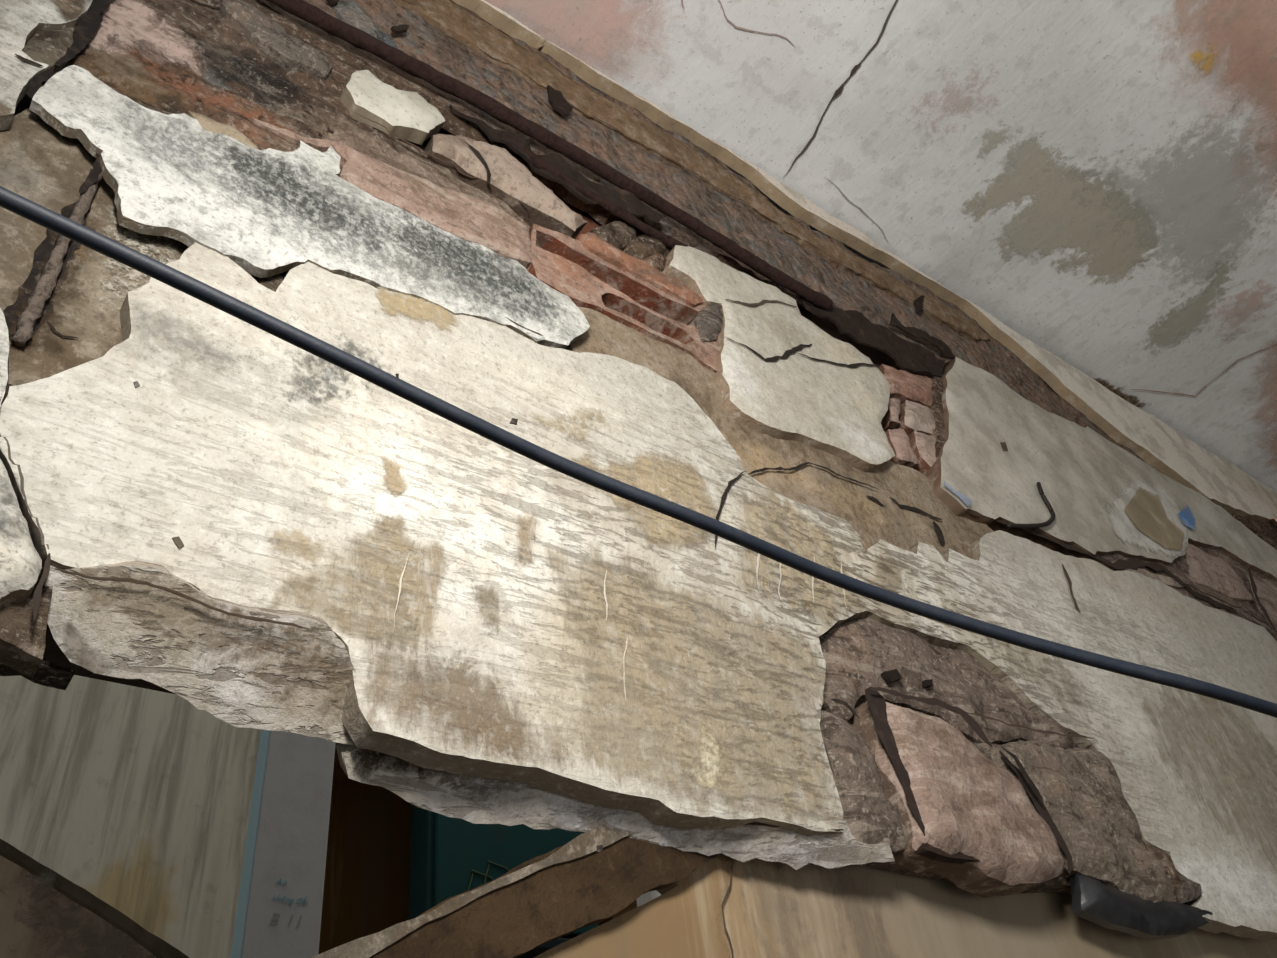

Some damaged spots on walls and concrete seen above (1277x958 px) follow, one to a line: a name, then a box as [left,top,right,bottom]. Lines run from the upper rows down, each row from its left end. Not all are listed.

crack [785,0,898,175]
spalling [0,0,1277,649]
crack [726,337,881,367]
leakage [961,129,1166,283]
leakage [1146,254,1234,354]
flaking render [0,459,112,690]
crack [0,384,309,629]
flaking render [819,617,1202,904]